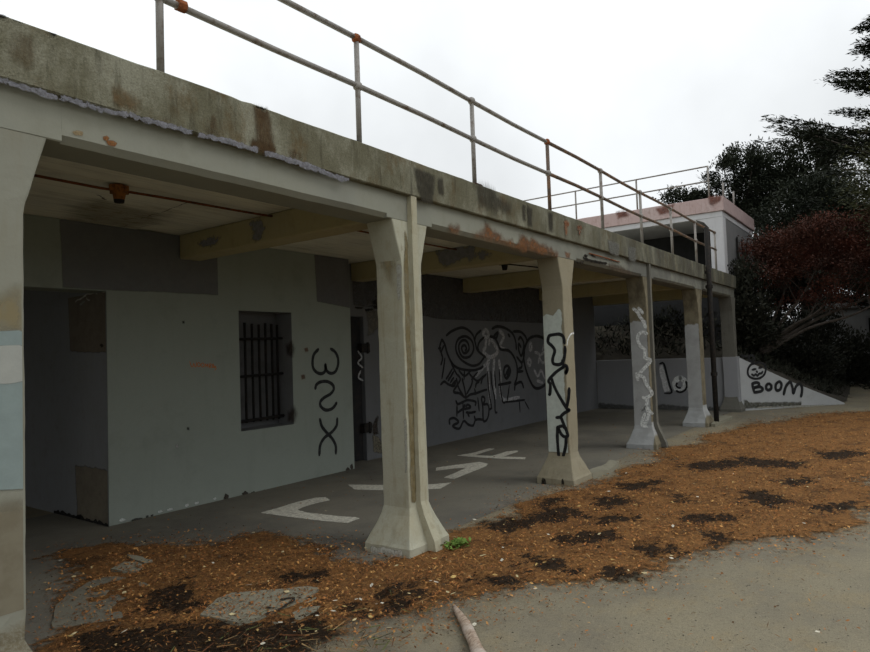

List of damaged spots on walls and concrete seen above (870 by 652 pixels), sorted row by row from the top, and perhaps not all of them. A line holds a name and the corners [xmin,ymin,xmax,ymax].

peeling [0,78,349,182]
damp [415,169,444,203]
corrosion [480,225,570,258]